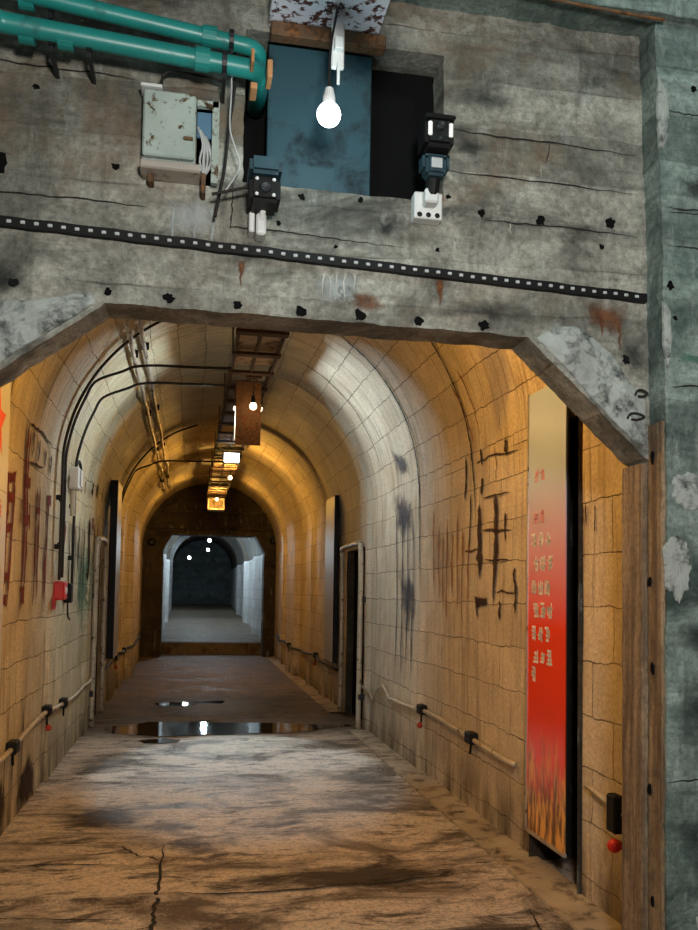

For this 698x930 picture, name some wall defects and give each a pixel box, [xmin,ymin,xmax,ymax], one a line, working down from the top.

water stain [394,413,417,471]
spalling [672,472,698,511]
water stain [395,501,414,673]
spalling [662,535,692,604]
crack [0,915,119,923]
crack [18,841,467,930]